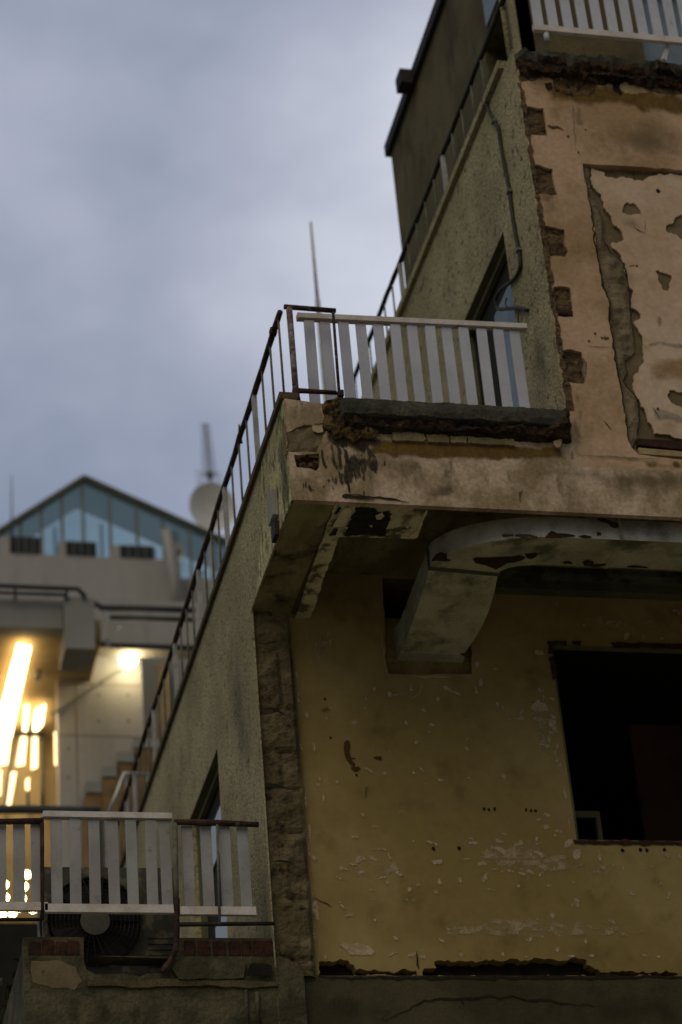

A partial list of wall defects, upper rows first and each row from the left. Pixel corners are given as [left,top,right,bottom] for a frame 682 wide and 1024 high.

spalling [514,47,682,449]
spalling [281,420,326,471]
flaking render [392,432,515,447]
water stain [303,432,392,537]
peeling [333,507,352,529]
peeling [465,813,625,891]
flaking render [22,937,84,990]
peeling [319,943,375,975]
spalling [388,936,596,976]